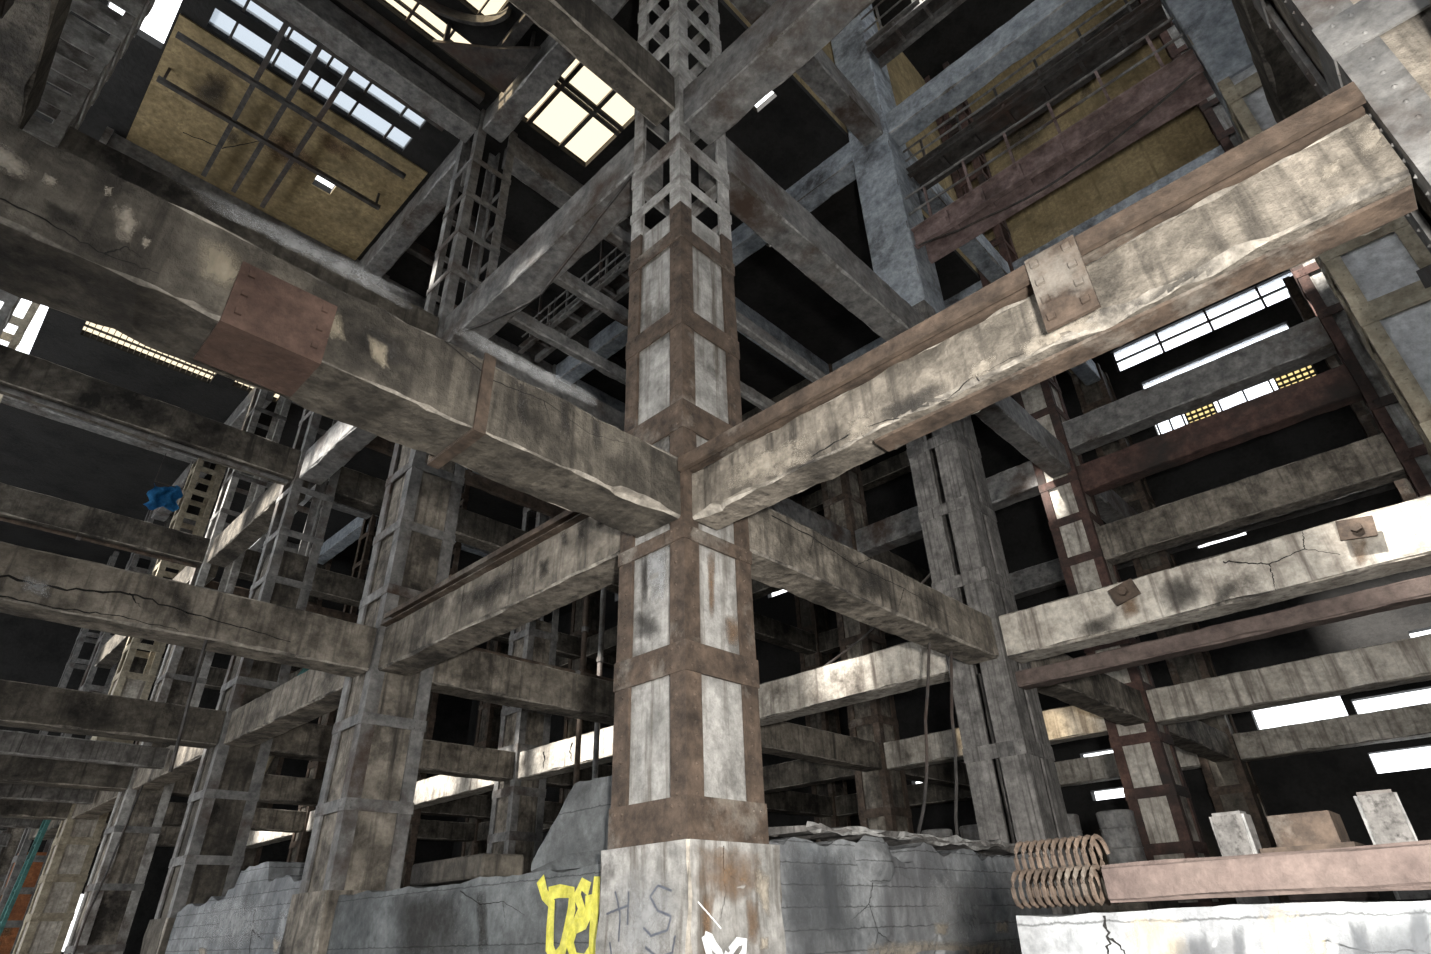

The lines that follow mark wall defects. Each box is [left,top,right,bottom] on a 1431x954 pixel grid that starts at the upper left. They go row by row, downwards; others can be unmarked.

rust [206,247,238,282]
rust [373,343,385,362]
crack [1103,916,1125,954]
leakage [1356,915,1428,954]